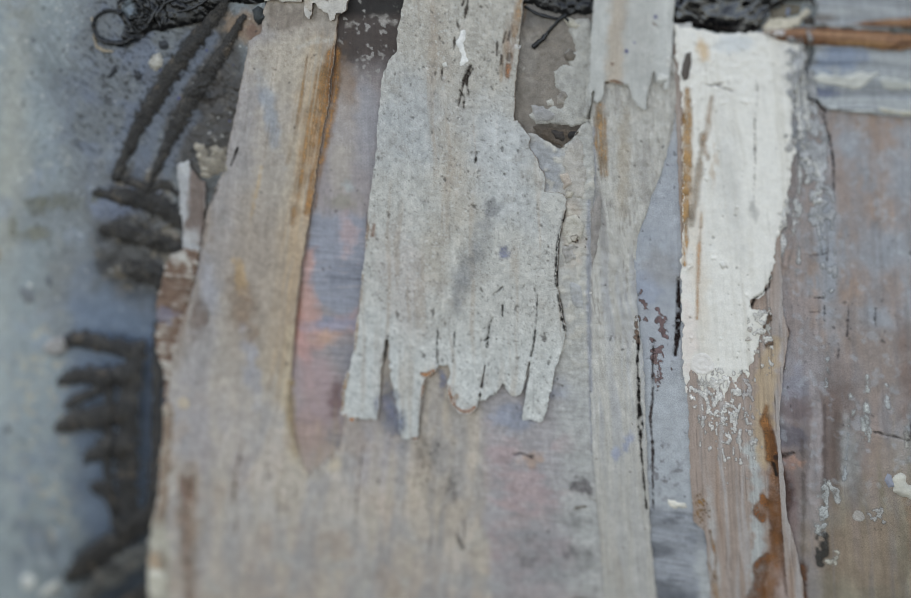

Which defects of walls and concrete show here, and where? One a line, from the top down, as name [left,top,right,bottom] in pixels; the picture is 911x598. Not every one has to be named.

peeling [456,30,468,66]
crack [536,211,566,331]
peeling [529,18,592,198]
peeling [562,214,591,264]
rust [681,88,705,266]
peeling [761,2,911,278]
rust [748,406,794,598]